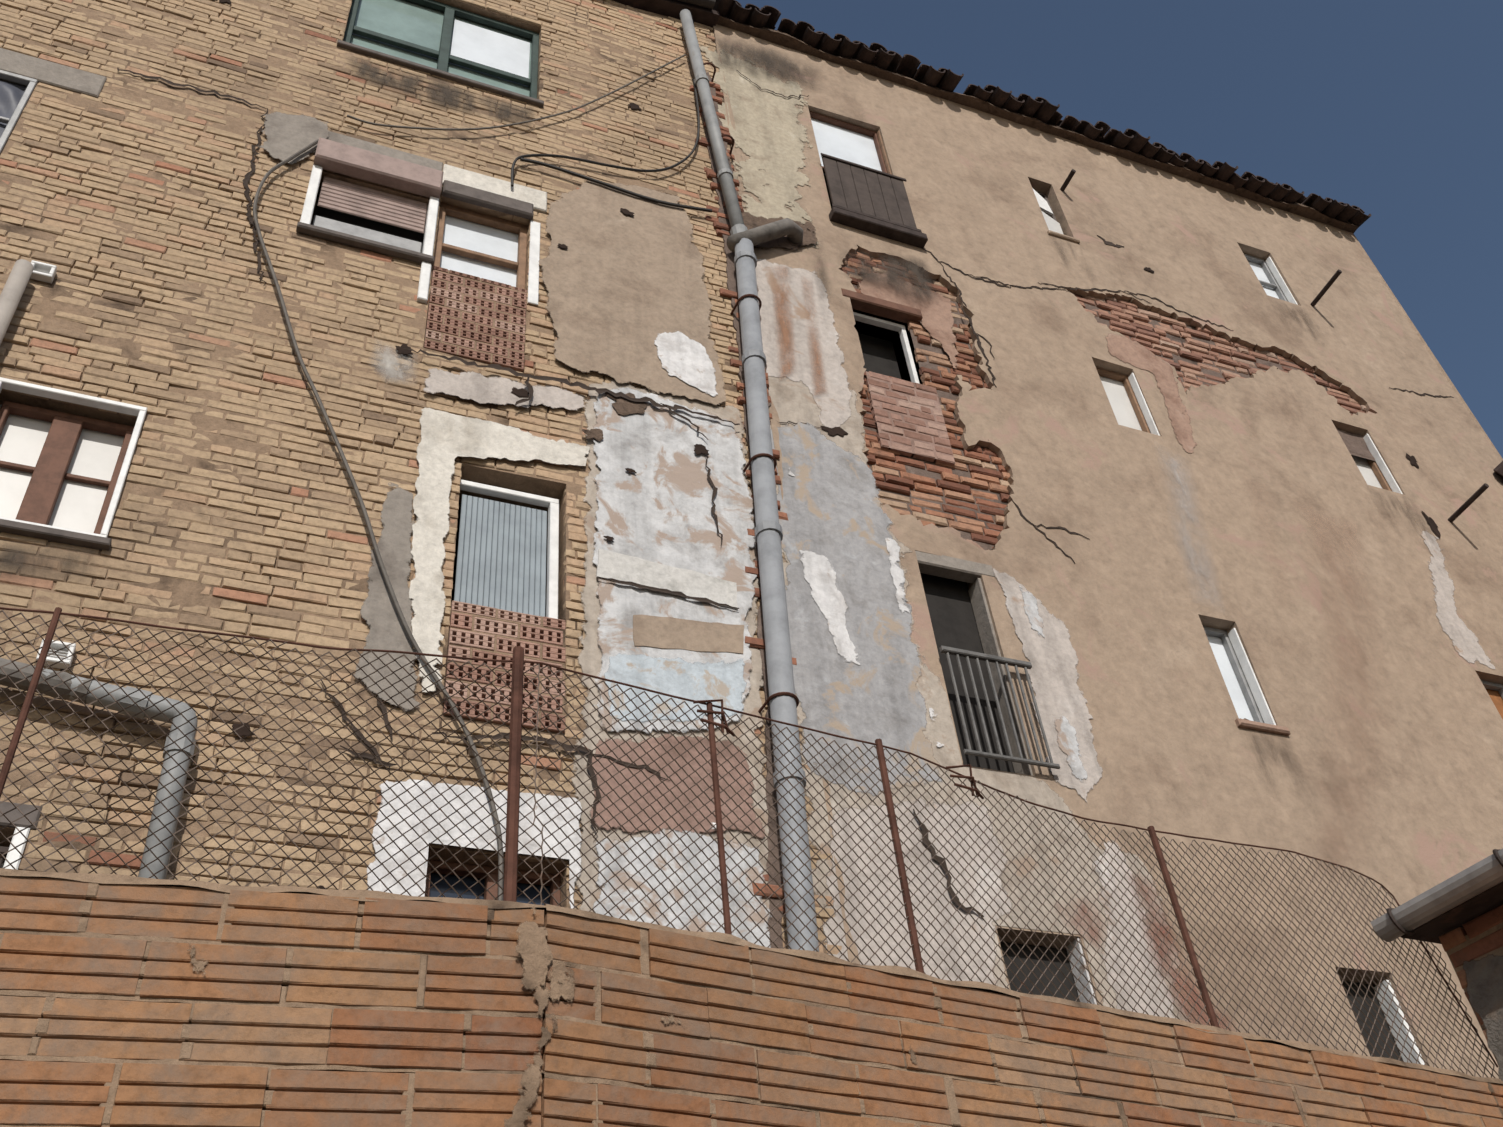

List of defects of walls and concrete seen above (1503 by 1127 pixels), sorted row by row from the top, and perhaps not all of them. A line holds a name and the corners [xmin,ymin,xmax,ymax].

crack [117,67,268,286]
crack [923,248,1234,386]
crack [1097,235,1124,247]
flaking render [1072,293,1375,461]
flaking render [367,43,813,949]
crack [1011,499,1089,563]
peeling [755,250,1192,1022]